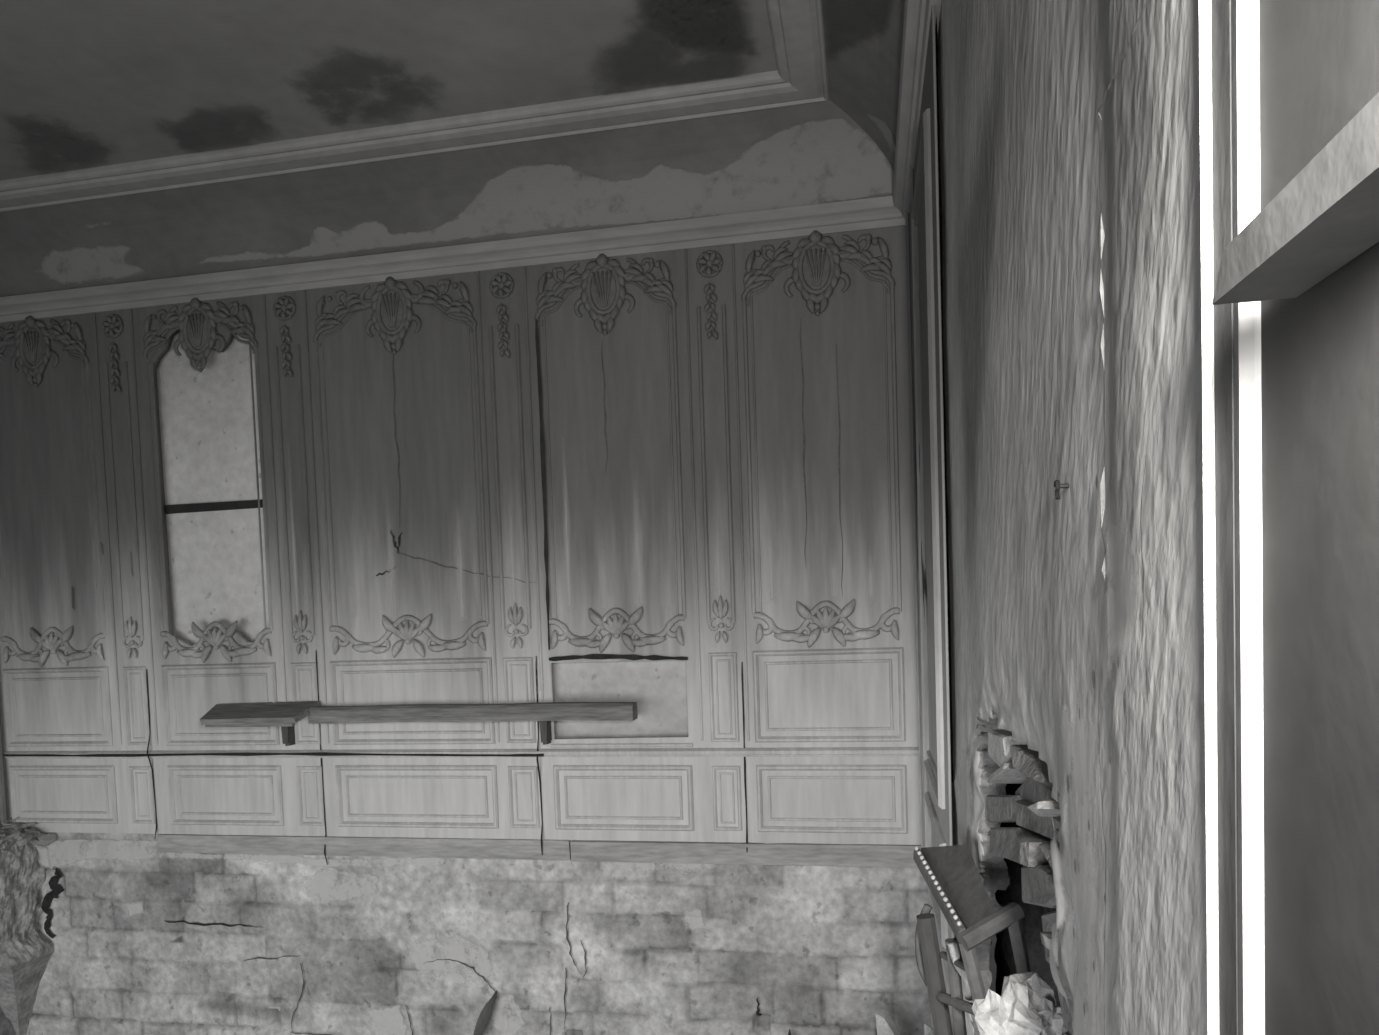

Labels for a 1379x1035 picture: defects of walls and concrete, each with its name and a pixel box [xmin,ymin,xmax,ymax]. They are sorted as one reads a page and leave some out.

peeling [199,112,896,263]
peeling [35,245,144,285]
spalling [954,730,1085,1035]